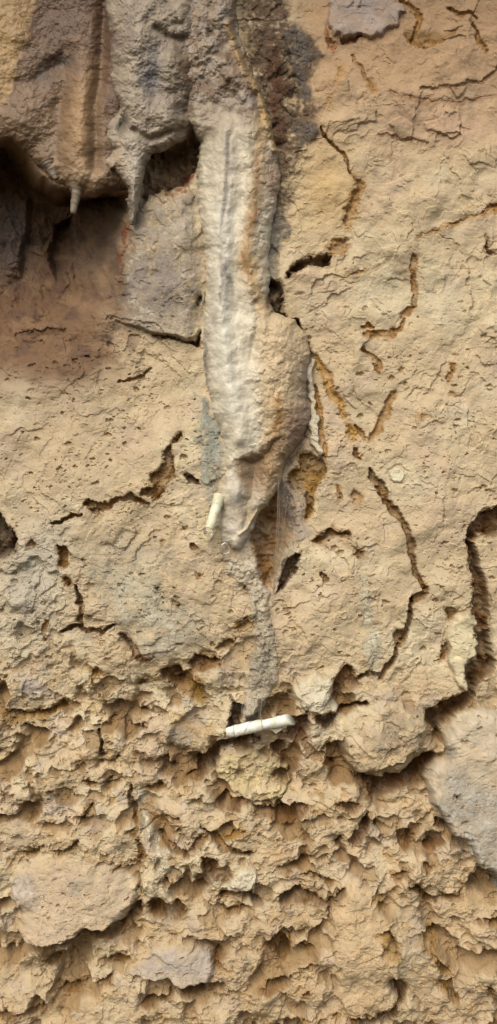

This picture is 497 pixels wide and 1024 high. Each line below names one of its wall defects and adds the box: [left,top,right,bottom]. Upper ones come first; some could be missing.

crack [350,0,497,113]
damp [240,0,320,275]
crack [145,328,204,350]
crack [268,130,497,682]
crack [39,430,202,665]
spalling [12,666,151,859]
spalling [141,661,448,849]
spalling [155,784,350,929]
spalling [387,813,466,906]
spalling [0,874,190,1024]
spalling [134,940,231,1013]
spalling [255,924,411,1024]